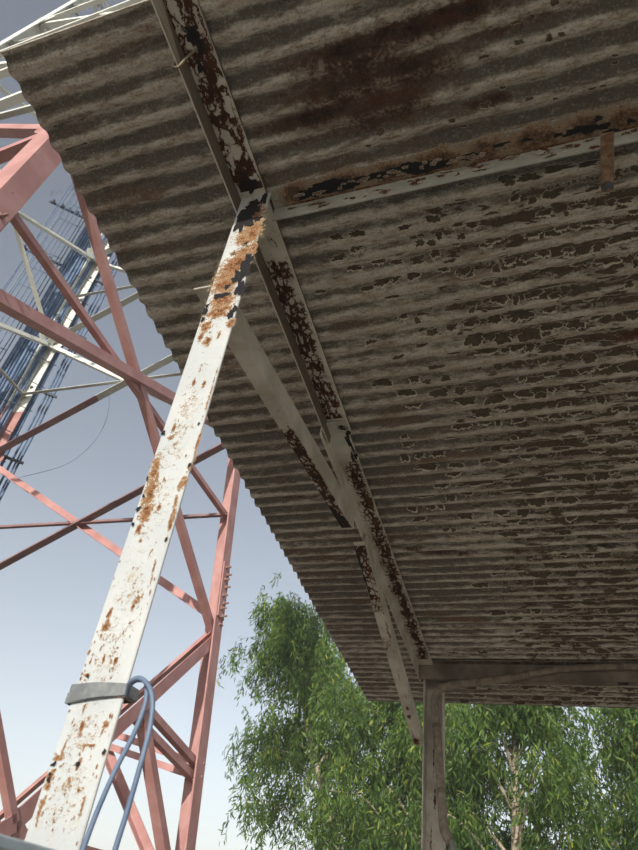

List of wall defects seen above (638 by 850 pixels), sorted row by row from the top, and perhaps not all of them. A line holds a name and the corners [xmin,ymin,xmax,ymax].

corrosion [35,701,113,832]
corrosion [254,259,430,659]
corrosion [163,0,638,353]
corrosion [406,547,469,556]
peeling [328,159,638,541]
peeling [458,685,638,706]